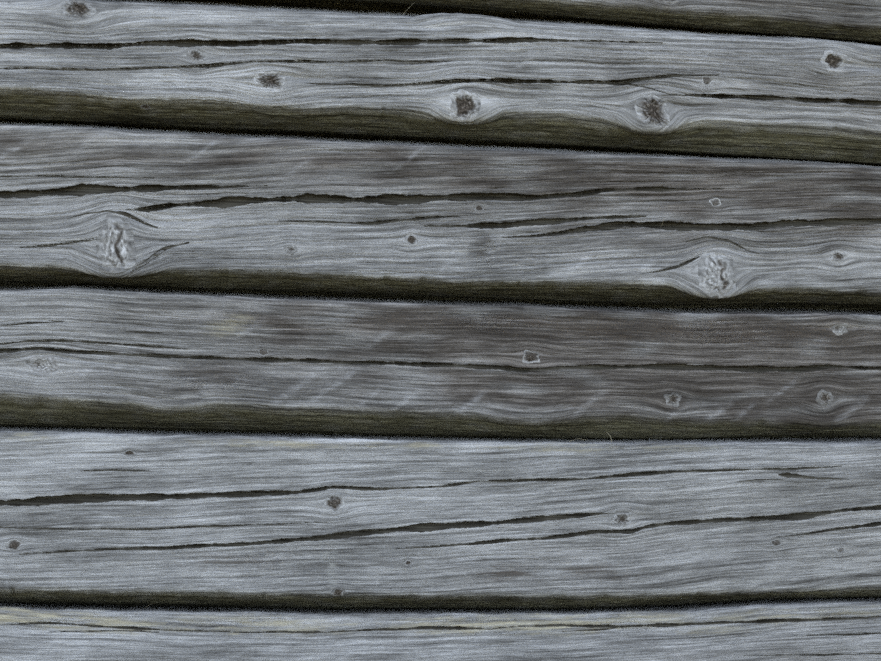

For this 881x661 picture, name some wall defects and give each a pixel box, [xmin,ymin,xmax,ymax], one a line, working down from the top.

crack [0,37,881,106]
crack [0,175,881,276]
crack [0,466,846,506]
crack [0,505,881,555]
crack [9,616,881,656]